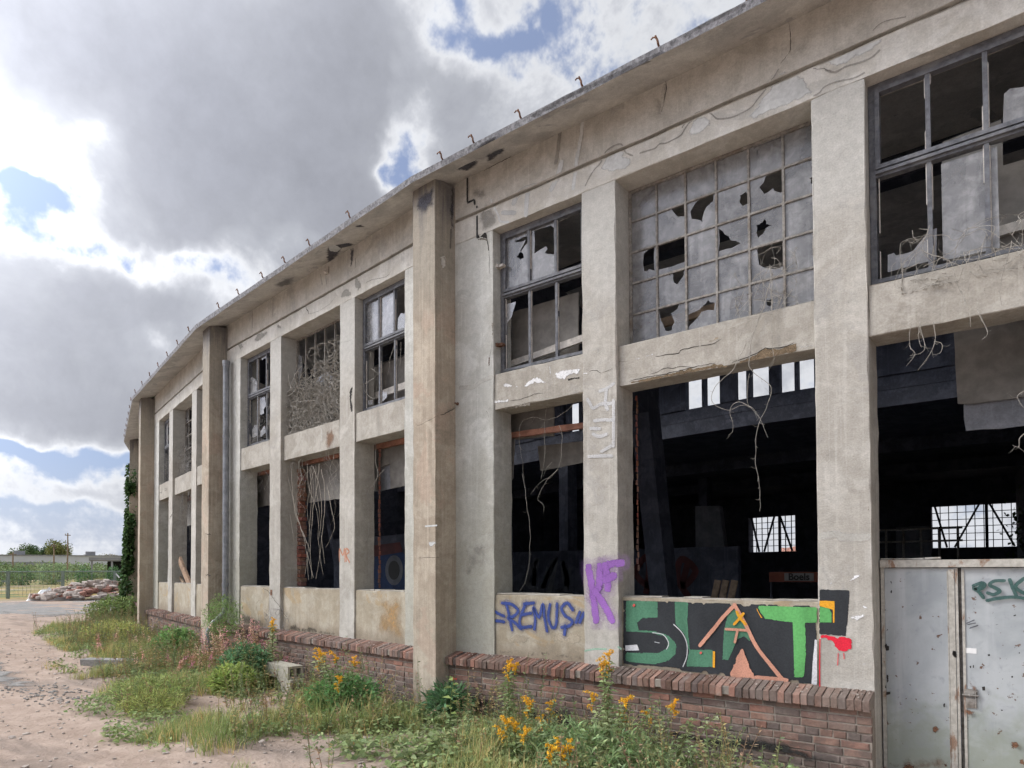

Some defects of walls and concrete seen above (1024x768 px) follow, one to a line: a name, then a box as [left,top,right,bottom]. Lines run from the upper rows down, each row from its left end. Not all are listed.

peeling [458,137,504,171]
crack [466,157,510,238]
peeling [494,367,580,403]
spalling [631,343,811,571]